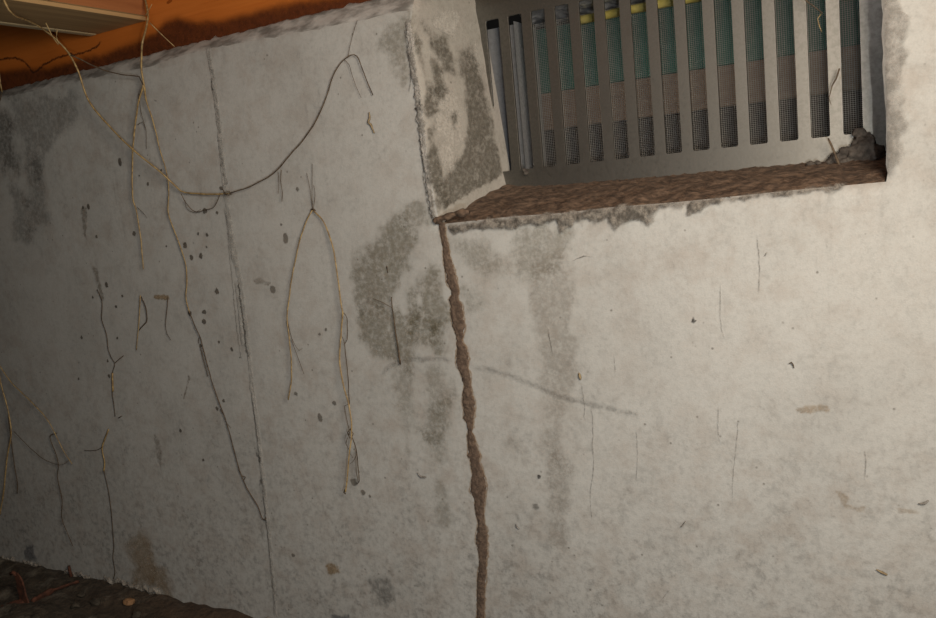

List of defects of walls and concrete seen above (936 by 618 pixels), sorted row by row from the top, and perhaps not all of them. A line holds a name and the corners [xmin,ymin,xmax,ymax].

damp [0,0,370,91]
damp [425,11,501,207]